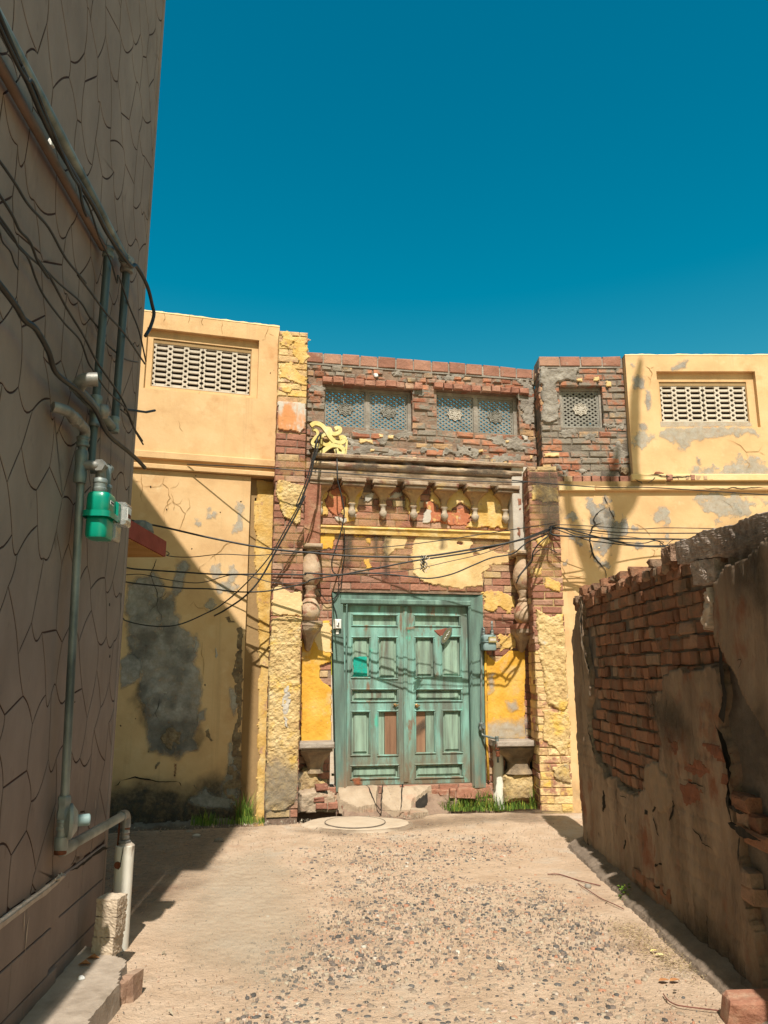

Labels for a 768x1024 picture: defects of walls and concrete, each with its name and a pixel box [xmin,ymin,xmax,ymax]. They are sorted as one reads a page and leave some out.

peeling [631,363,651,410]
peeling [633,422,756,450]
peeling [654,456,768,481]
crack [141,474,190,532]
peeling [566,495,644,569]
peeling [654,507,671,541]
peeling [695,493,768,522]
leakage [120,561,205,757]
flaking render [130,480,311,833]
flaking render [488,565,734,812]
crack [688,643,761,858]